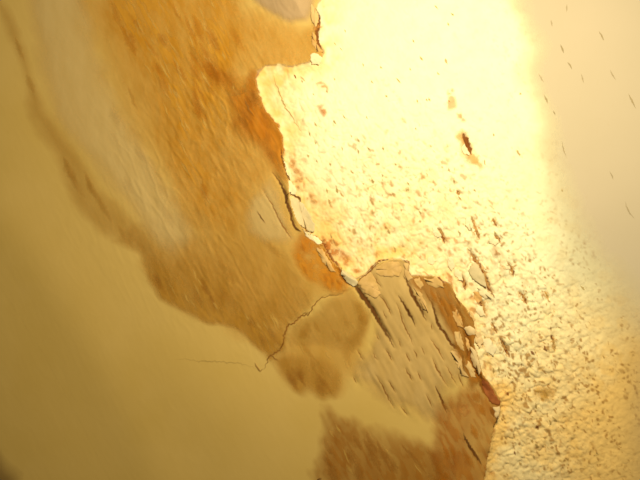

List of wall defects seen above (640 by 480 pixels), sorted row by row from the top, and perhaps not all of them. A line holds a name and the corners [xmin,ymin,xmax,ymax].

water stain [36,0,184,241]
water stain [93,0,333,354]
crack [256,296,327,371]
spalling [256,0,640,480]